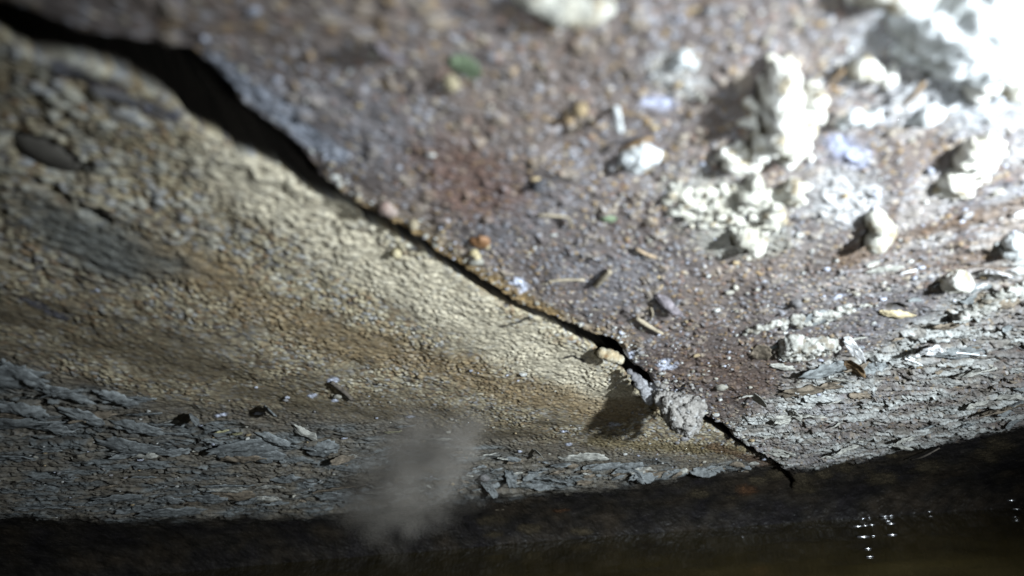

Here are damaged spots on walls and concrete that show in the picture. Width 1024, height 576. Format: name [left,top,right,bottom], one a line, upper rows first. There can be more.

efflorescence [845,0,1024,200]
efflorescence [660,49,883,261]
efflorescence [823,180,898,255]
water stain [993,232,1024,261]
peeling [866,261,918,274]
peeling [959,269,1020,310]
peeling [792,297,922,328]
peeling [928,322,964,330]
peeling [915,345,998,378]
peeling [961,381,1024,429]
peeling [890,425,941,451]